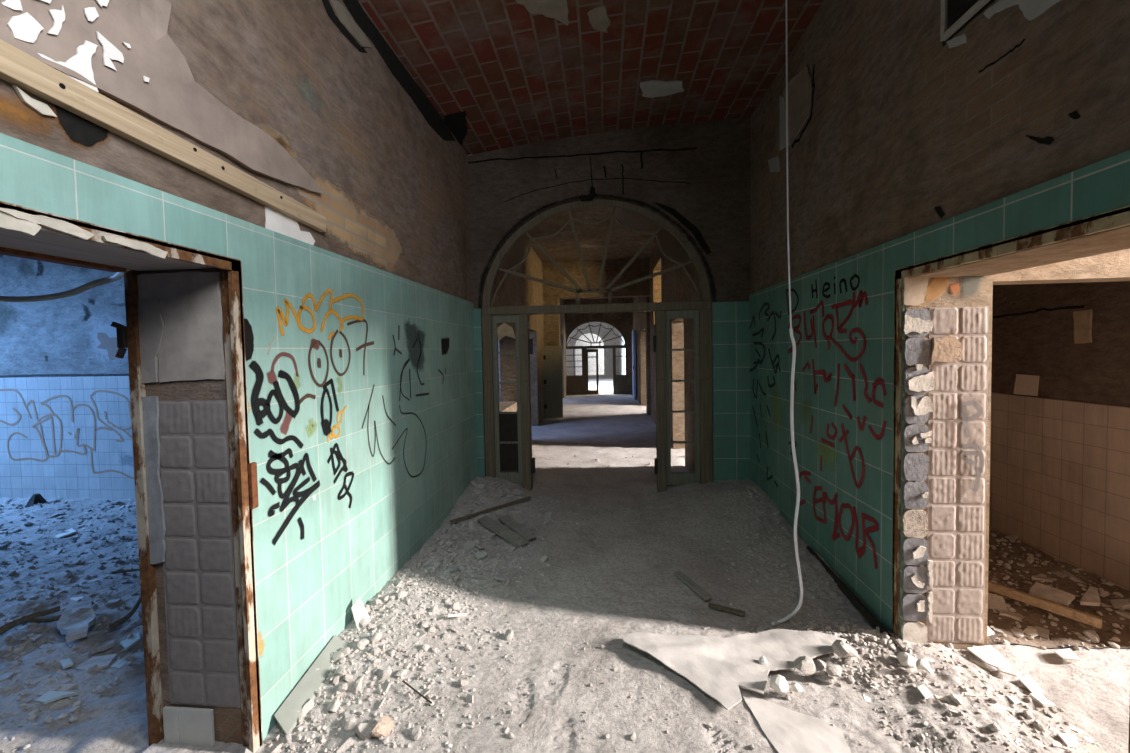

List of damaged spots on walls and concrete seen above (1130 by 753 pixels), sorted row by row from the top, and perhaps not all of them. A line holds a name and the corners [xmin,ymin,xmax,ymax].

flaking render [0,0,403,274]
peeling [946,33,967,49]
peeling [983,0,1061,21]
spalling [92,321,121,361]
peeling [137,271,241,708]
peeling [901,306,989,644]